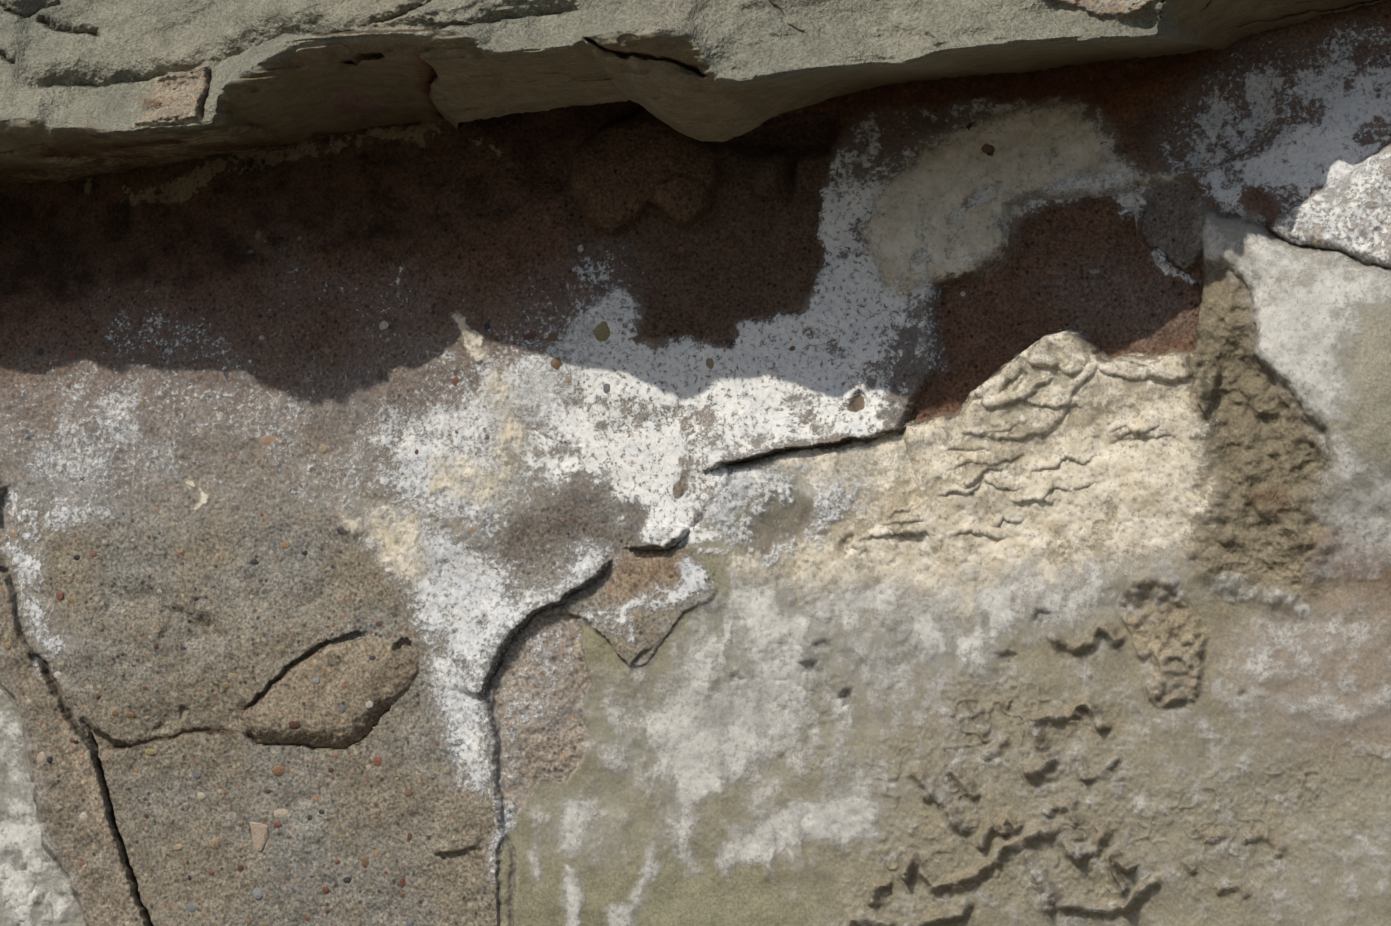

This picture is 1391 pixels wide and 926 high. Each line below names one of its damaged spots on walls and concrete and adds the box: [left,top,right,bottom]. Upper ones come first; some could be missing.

peeling [566,107,840,346]
water stain [0,308,315,671]
crack [685,417,956,531]
water stain [292,22,1391,890]
spalling [851,391,868,412]
spalling [876,184,1222,536]
crack [482,581,595,696]
crack [670,593,717,634]
spalling [1119,573,1207,708]
water stain [0,691,74,926]
crack [24,651,241,926]
water stain [561,865,584,926]